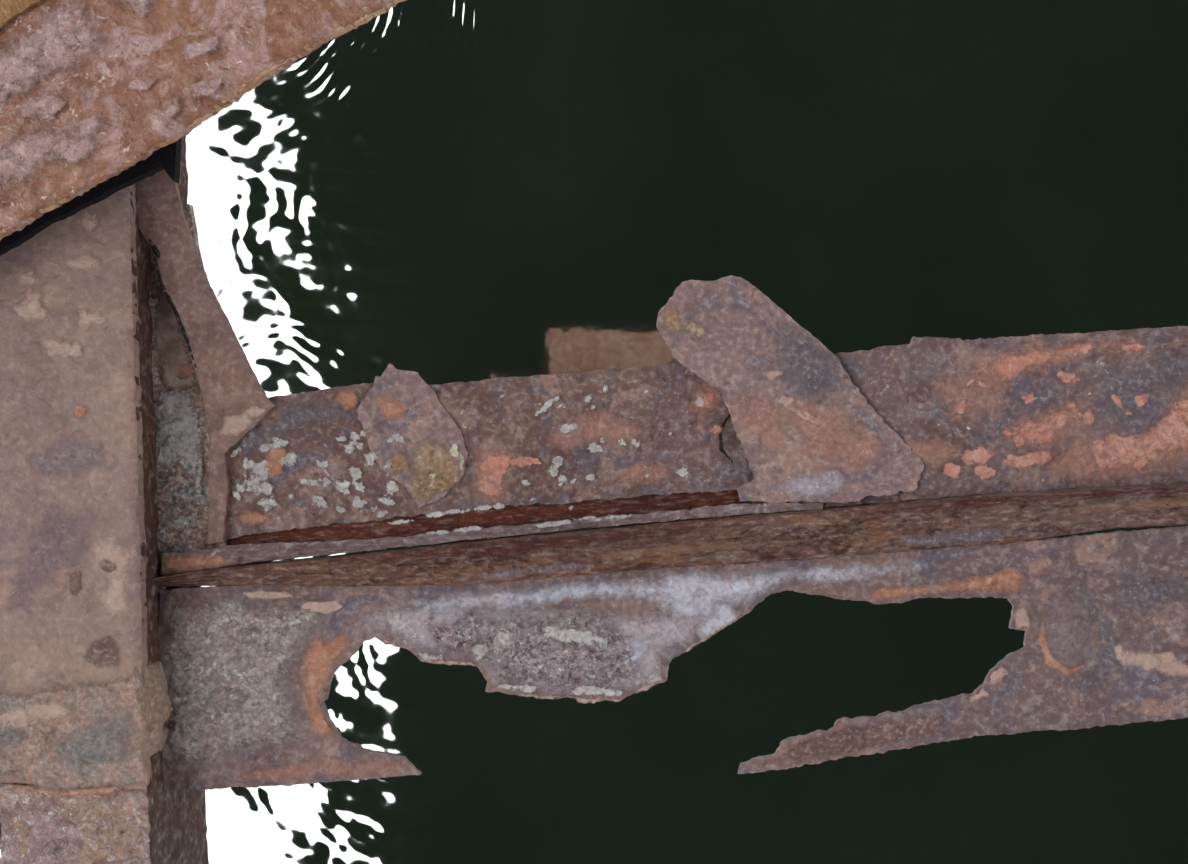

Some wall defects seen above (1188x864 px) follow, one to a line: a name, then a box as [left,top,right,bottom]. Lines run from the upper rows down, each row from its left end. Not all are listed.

corrosion [224,408,264,434]
crack [695,374,741,463]
corrosion [390,443,458,500]
corrosion [96,537,133,615]
corrosion [873,569,1021,598]
peeling [1016,610,1029,627]
corrosion [84,636,118,667]
corrosion [305,638,345,733]
peeling [422,621,481,665]
peeling [504,641,624,699]
peeling [971,668,1004,701]
corrosion [1,704,67,728]